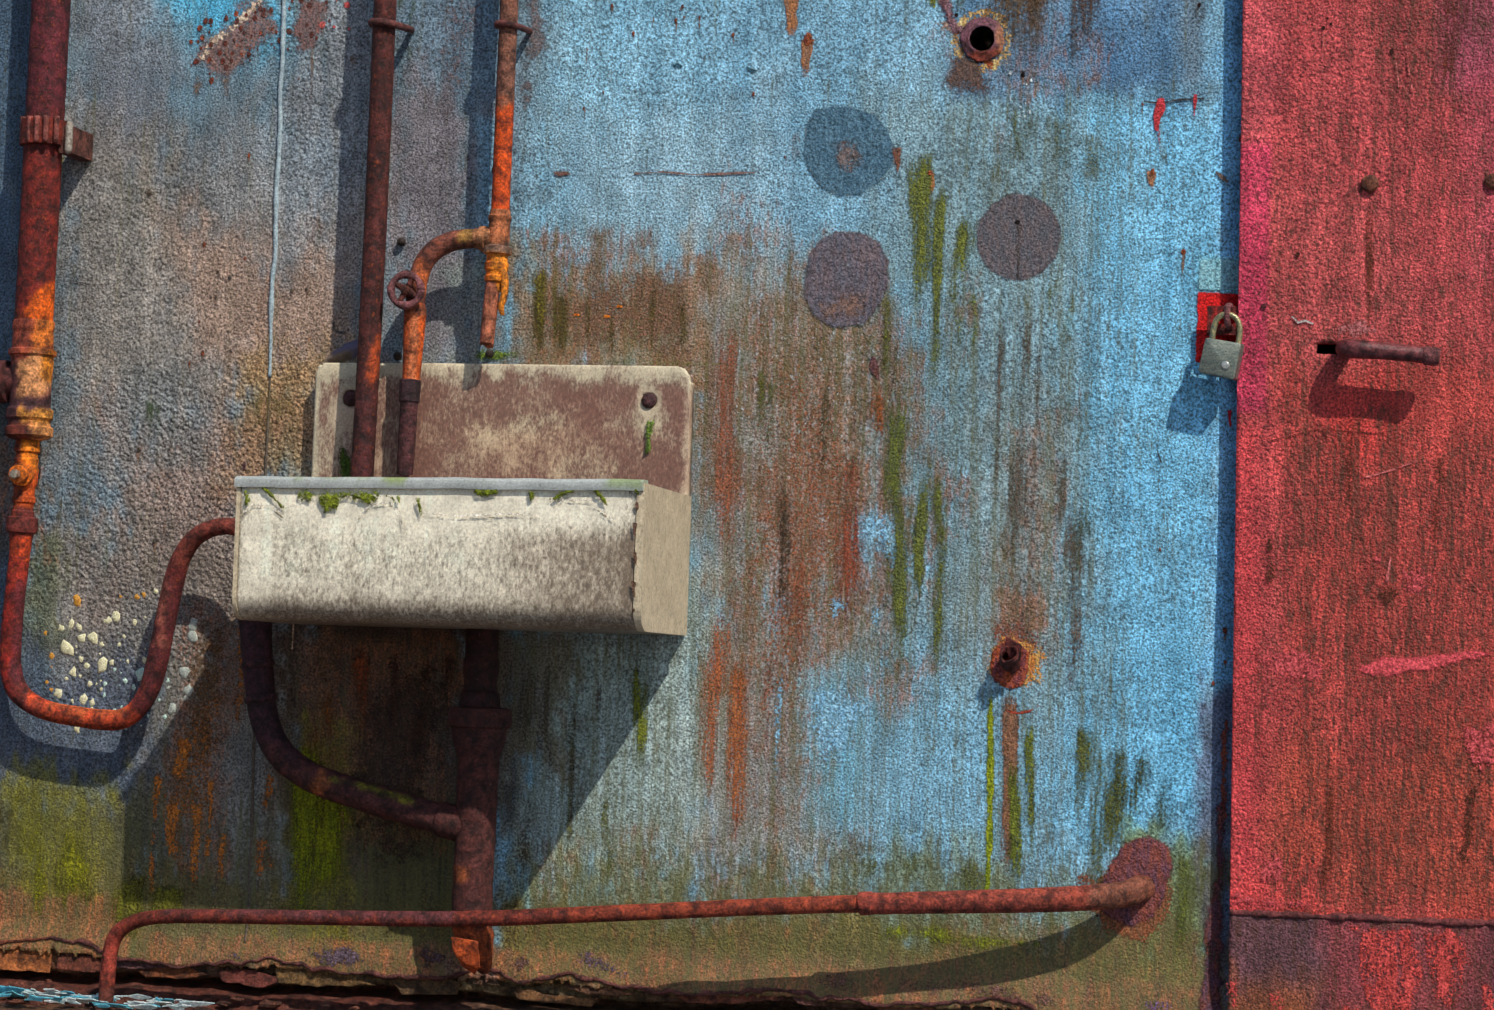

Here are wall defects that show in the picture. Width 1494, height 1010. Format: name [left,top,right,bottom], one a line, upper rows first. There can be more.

peeling [189,0,350,98]
rust [937,0,1048,94]
rust [1070,0,1100,56]
rust [532,267,688,356]
rust [698,314,889,837]
rust [148,623,244,892]
rust [987,618,1052,864]
rust [1077,835,1174,945]
rust [1199,721,1229,1010]
peeling [308,946,364,967]
peeling [413,937,480,975]
rust [0,936,1037,1010]